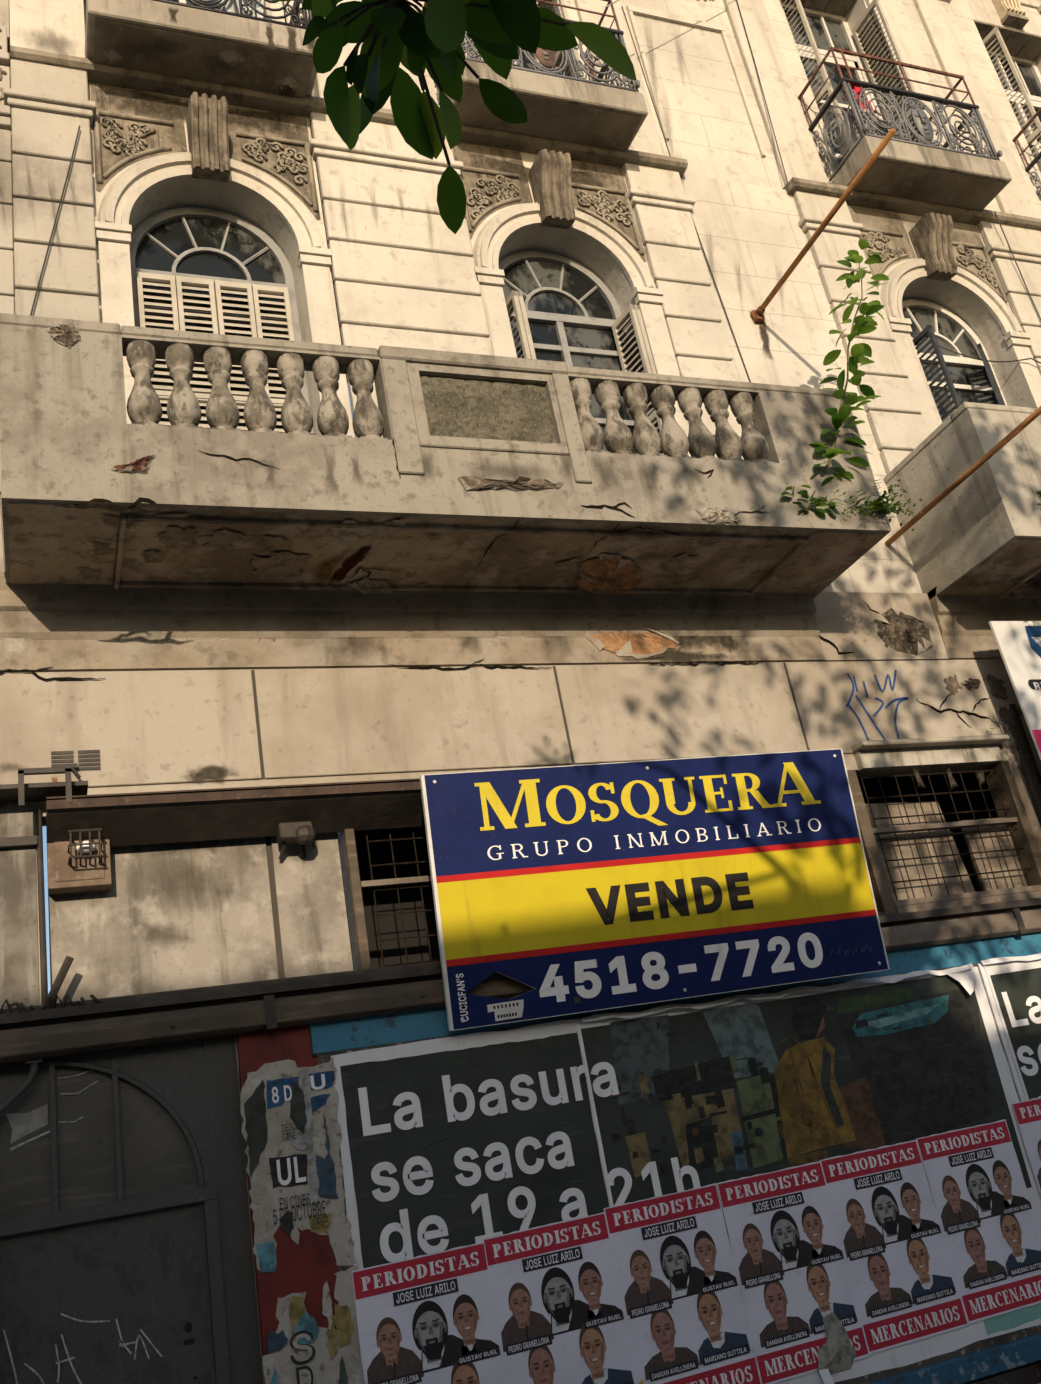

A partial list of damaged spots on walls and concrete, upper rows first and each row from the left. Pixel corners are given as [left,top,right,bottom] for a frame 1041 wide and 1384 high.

spalling [111,454,155,473]
spalling [458,475,564,491]
crack [54,497,163,514]
corrosion [317,547,371,585]
crack [346,567,399,581]
spalling [584,612,682,659]
spalling [871,604,935,659]
crack [0,667,104,681]
crack [916,688,997,728]